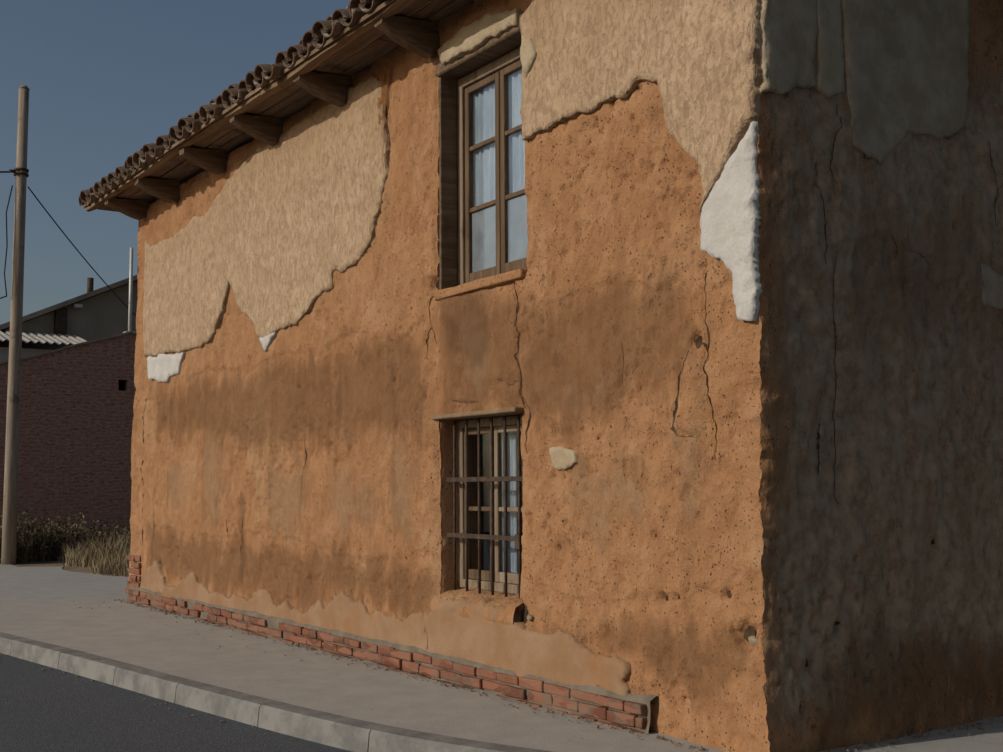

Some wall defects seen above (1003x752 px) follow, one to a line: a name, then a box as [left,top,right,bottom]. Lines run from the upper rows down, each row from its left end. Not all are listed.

peeling [438,0,970,322]
crack [501,282,531,454]
crack [671,258,717,460]
crack [815,105,842,503]
spalling [140,560,631,695]